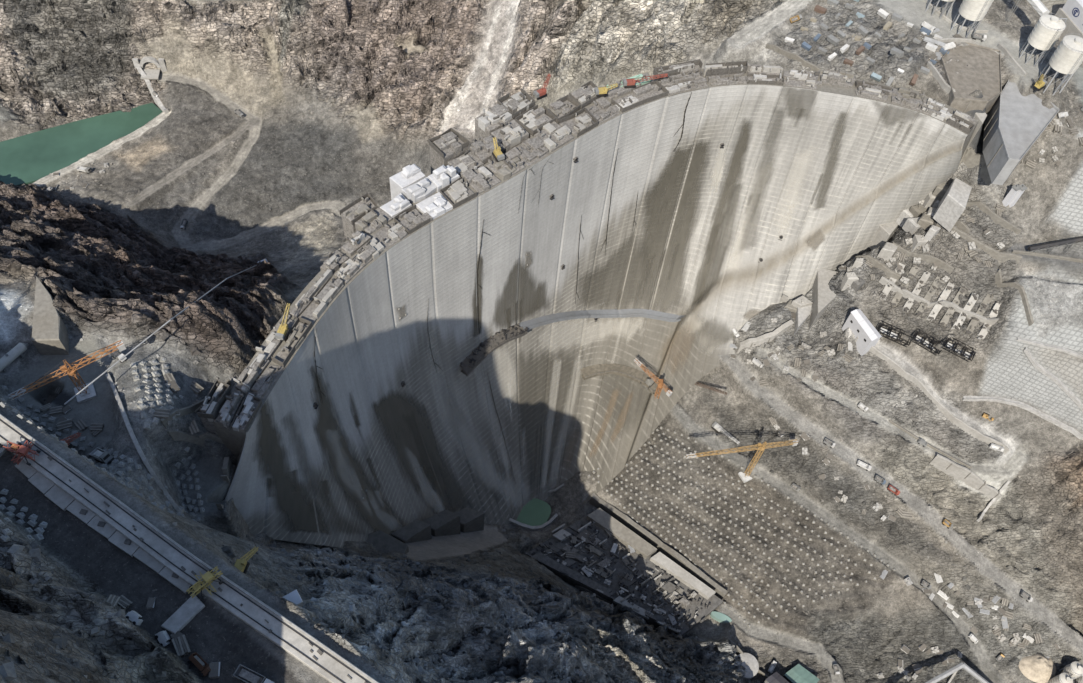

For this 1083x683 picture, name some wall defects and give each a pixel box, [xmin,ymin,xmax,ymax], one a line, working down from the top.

crack [575,148,638,301]
water stain [583,143,707,313]
crack [673,92,692,152]
water stain [693,123,749,304]
water stain [817,124,842,208]
water stain [473,257,483,336]
water stain [495,263,545,329]
water stain [312,368,403,535]
water stain [374,392,469,514]